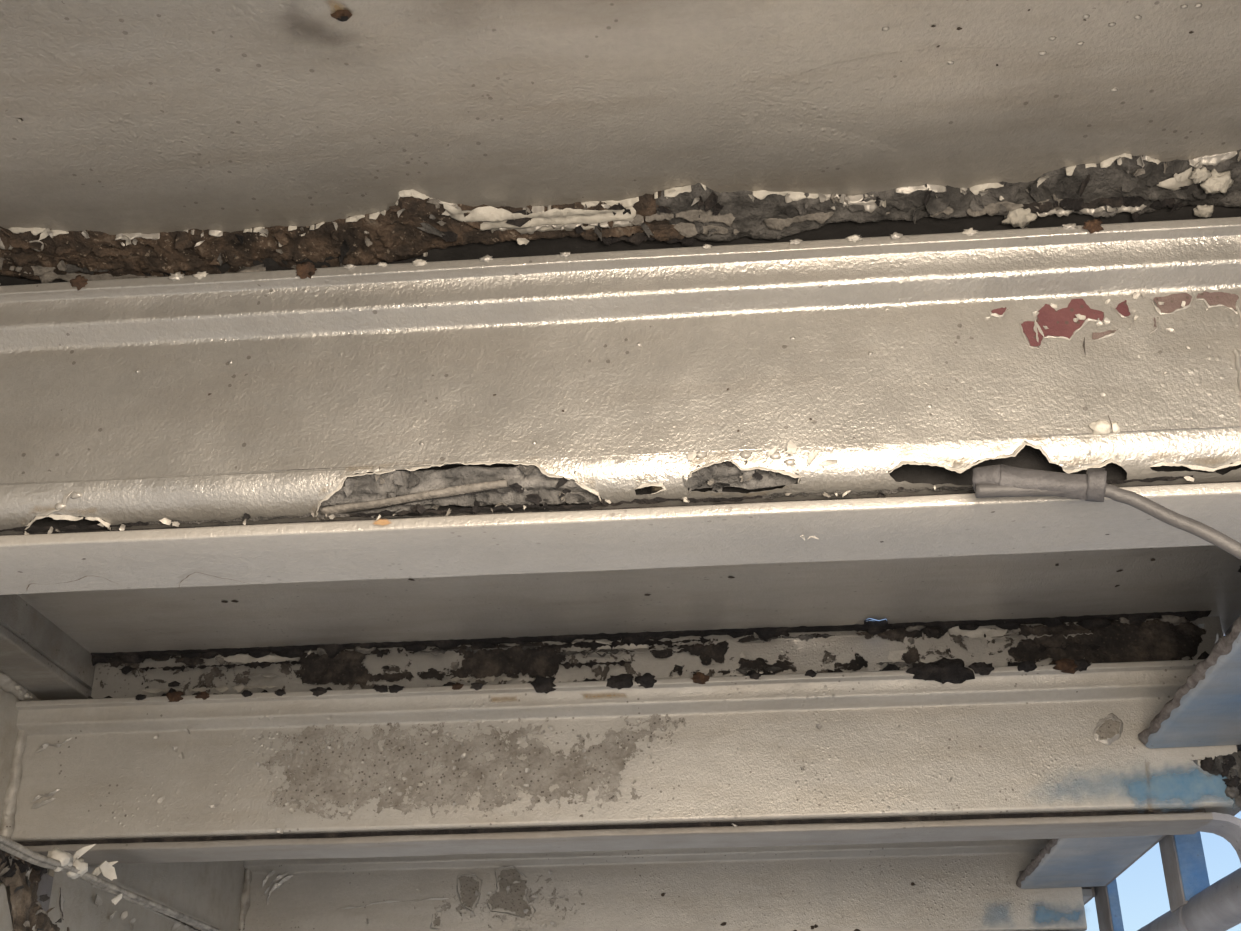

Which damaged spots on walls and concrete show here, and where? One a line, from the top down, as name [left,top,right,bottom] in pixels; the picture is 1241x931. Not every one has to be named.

corrosion [498,209,740,246]
corrosion [764,184,1238,234]
corrosion [0,239,205,290]
corrosion [290,242,415,279]
peeling [1019,286,1241,355]
spalling [23,490,125,535]
spalling [391,460,518,471]
spalling [351,499,611,518]
spalling [635,483,666,495]
spalling [878,435,1127,498]
spalling [1150,463,1241,482]
corrosion [100,616,1241,745]